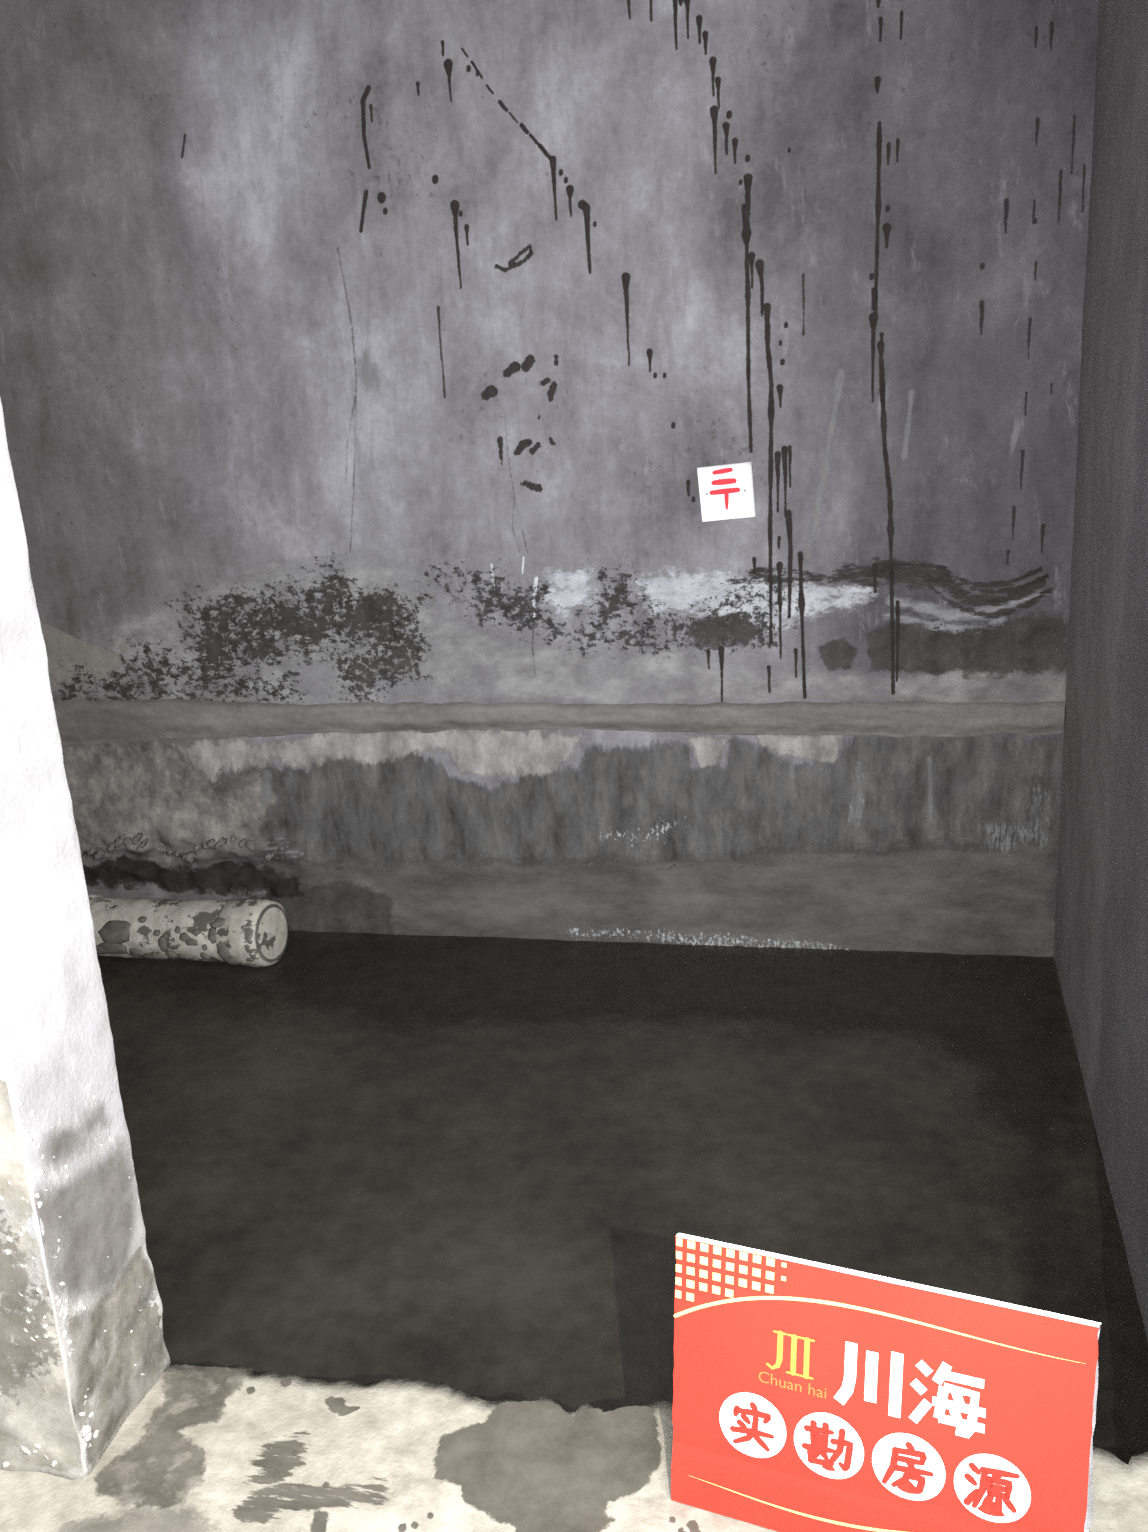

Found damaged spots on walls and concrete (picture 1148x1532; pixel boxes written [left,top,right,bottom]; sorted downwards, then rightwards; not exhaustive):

water stain [1058,115,1085,220]
water stain [53,0,1067,704]
water stain [200,735,1063,957]
water stain [0,1081,255,1532]
water stain [325,1396,360,1416]
water stain [233,1431,390,1532]
water stain [398,1513,434,1532]
water stain [434,1401,661,1532]
water stain [669,1517,700,1532]